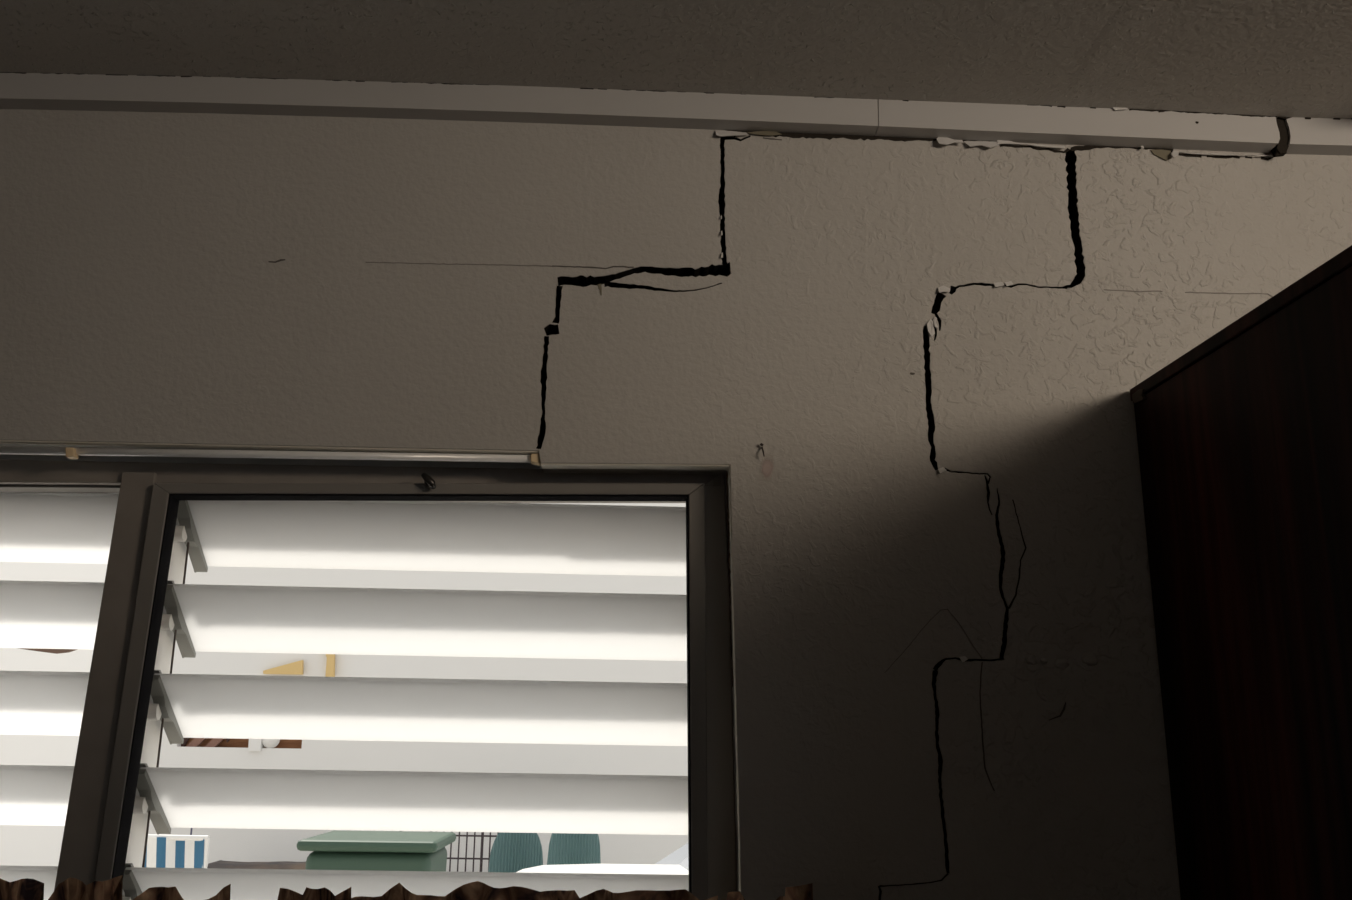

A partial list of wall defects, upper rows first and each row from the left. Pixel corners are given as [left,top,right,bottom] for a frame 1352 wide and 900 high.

crack [365,105,1352,900]